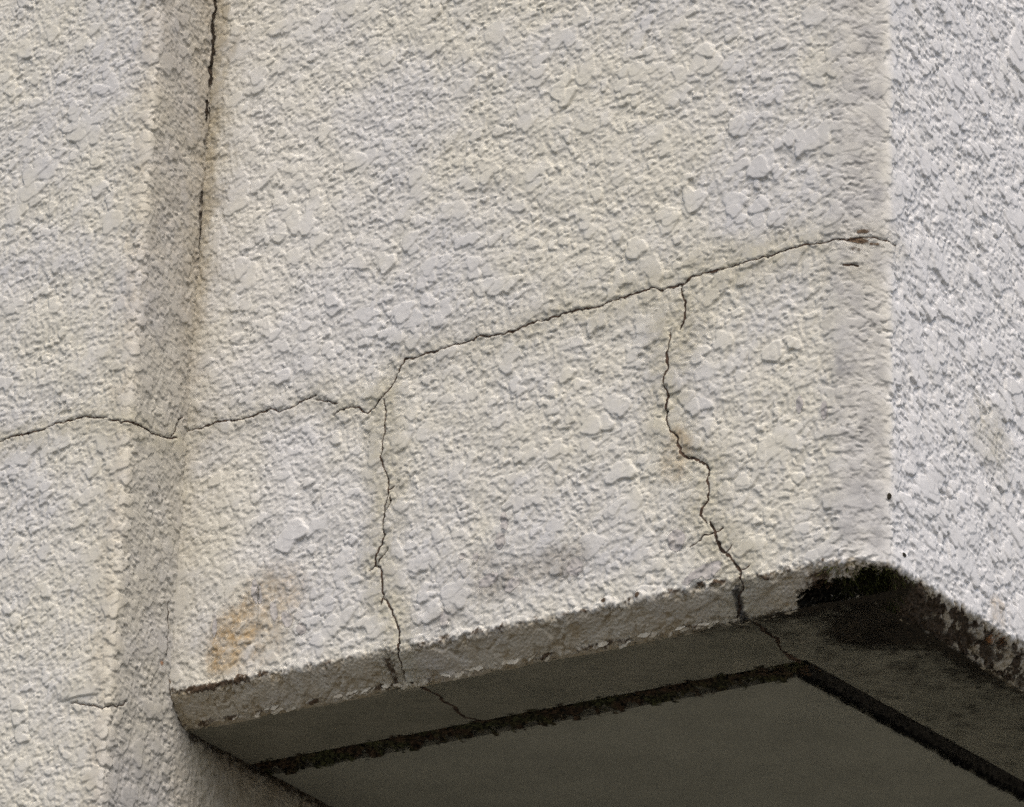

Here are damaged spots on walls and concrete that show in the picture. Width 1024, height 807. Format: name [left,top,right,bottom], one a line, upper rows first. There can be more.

crack [199,0,217,244]
crack [0,237,1024,765]
water stain [646,238,1024,700]